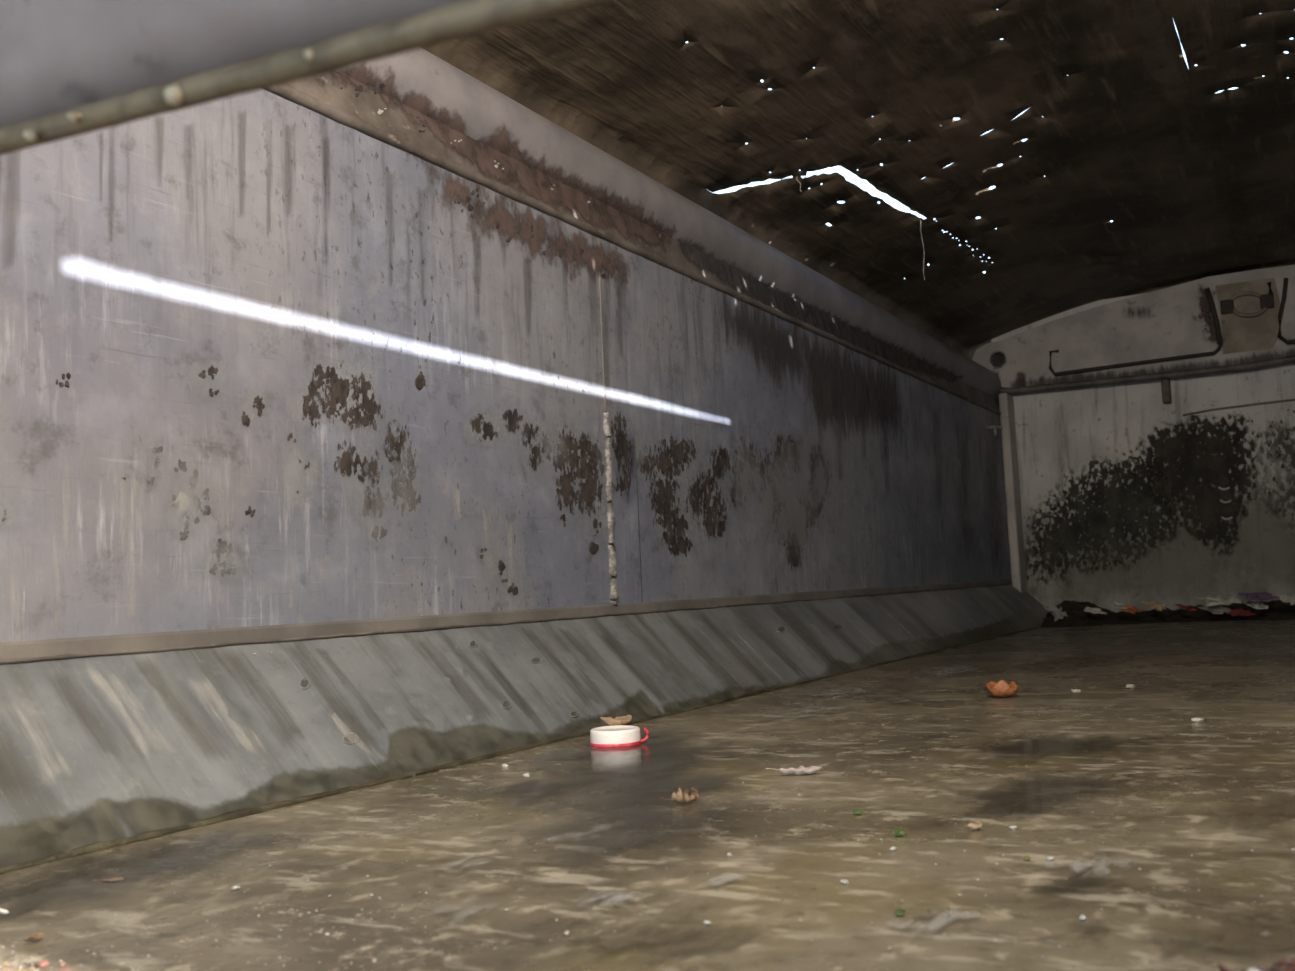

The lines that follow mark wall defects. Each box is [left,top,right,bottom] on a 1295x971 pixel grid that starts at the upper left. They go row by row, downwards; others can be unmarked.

corrosion [331,64,961,381]
leakage [724,292,900,433]
leakage [1025,409,1295,604]